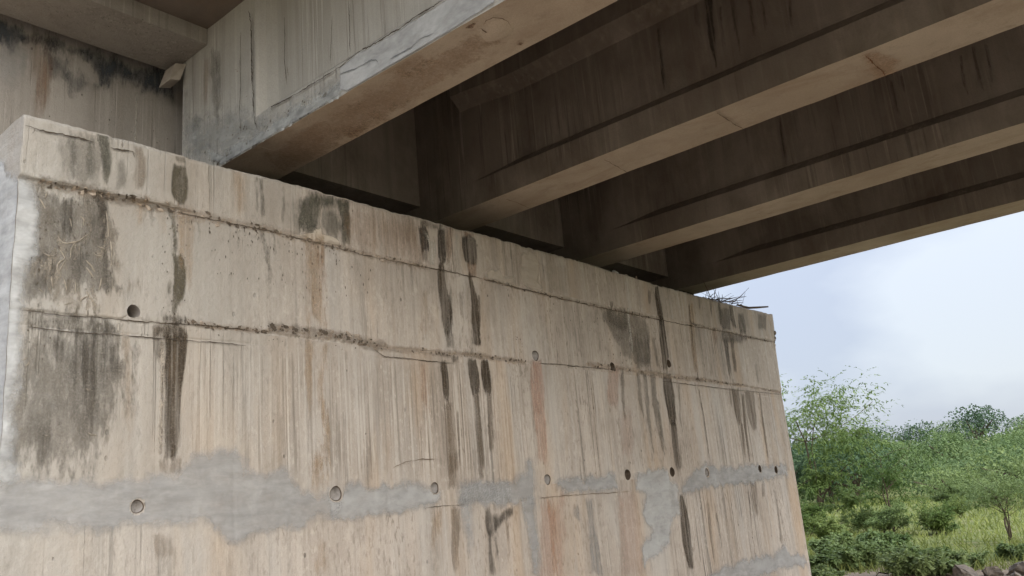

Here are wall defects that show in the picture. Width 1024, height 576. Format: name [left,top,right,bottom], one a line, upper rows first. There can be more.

water stain [172,165,188,204]
water stain [299,192,350,241]
water stain [462,236,481,345]
water stain [154,229,187,458]
water stain [441,357,454,400]
water stain [468,360,491,467]
water stain [655,286,681,467]
water stain [486,510,513,554]
water stain [680,496,693,568]